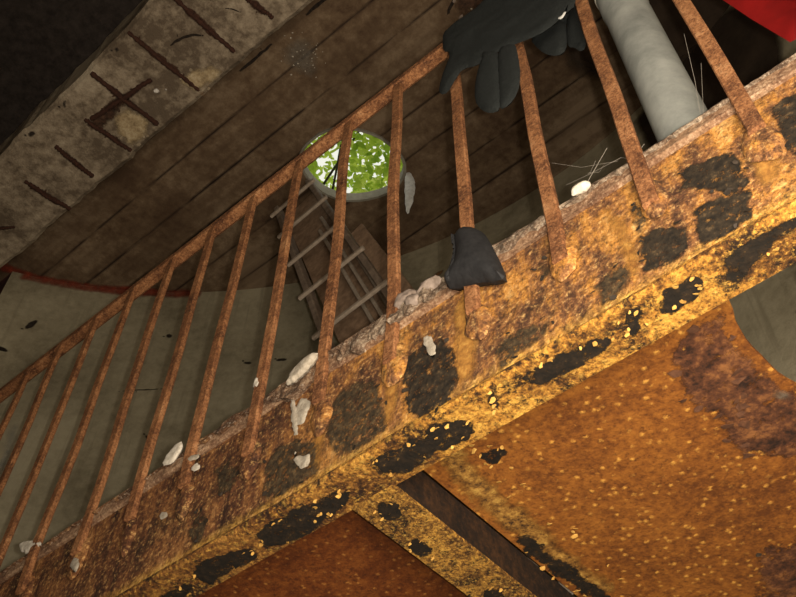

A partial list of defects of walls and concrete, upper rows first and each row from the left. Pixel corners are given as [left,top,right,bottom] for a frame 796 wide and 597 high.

corrosion [1,265,130,294]
corrosion [455,299,475,381]
corrosion [384,384,397,423]
corrosion [443,444,622,592]